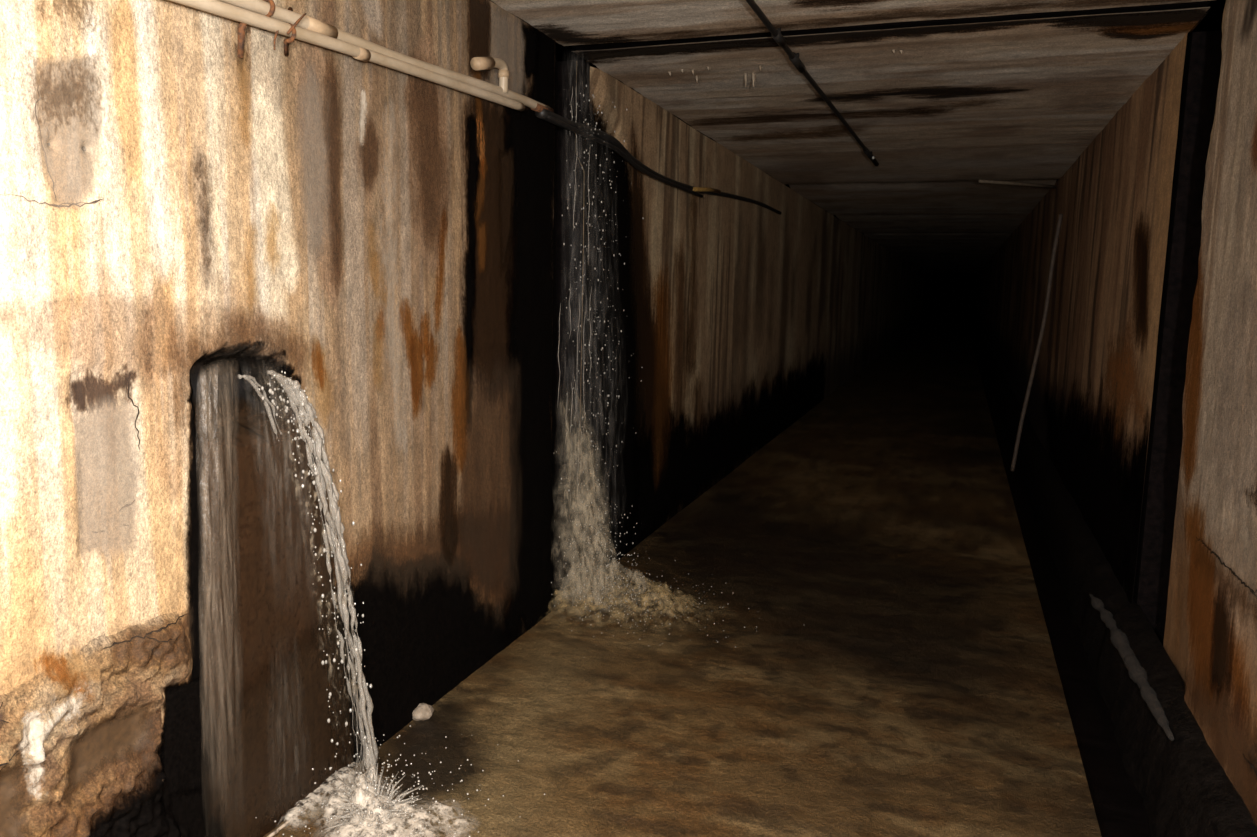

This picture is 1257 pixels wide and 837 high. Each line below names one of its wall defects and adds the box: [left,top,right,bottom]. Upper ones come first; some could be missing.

leakage [468,0,490,79]
leakage [522,8,1208,114]
crack [0,194,98,206]
leakage [576,105,826,587]
leakage [87,98,556,837]
crack [1196,537,1257,599]
crack [102,613,188,650]
leakage [21,699,80,794]
spalling [66,705,152,801]